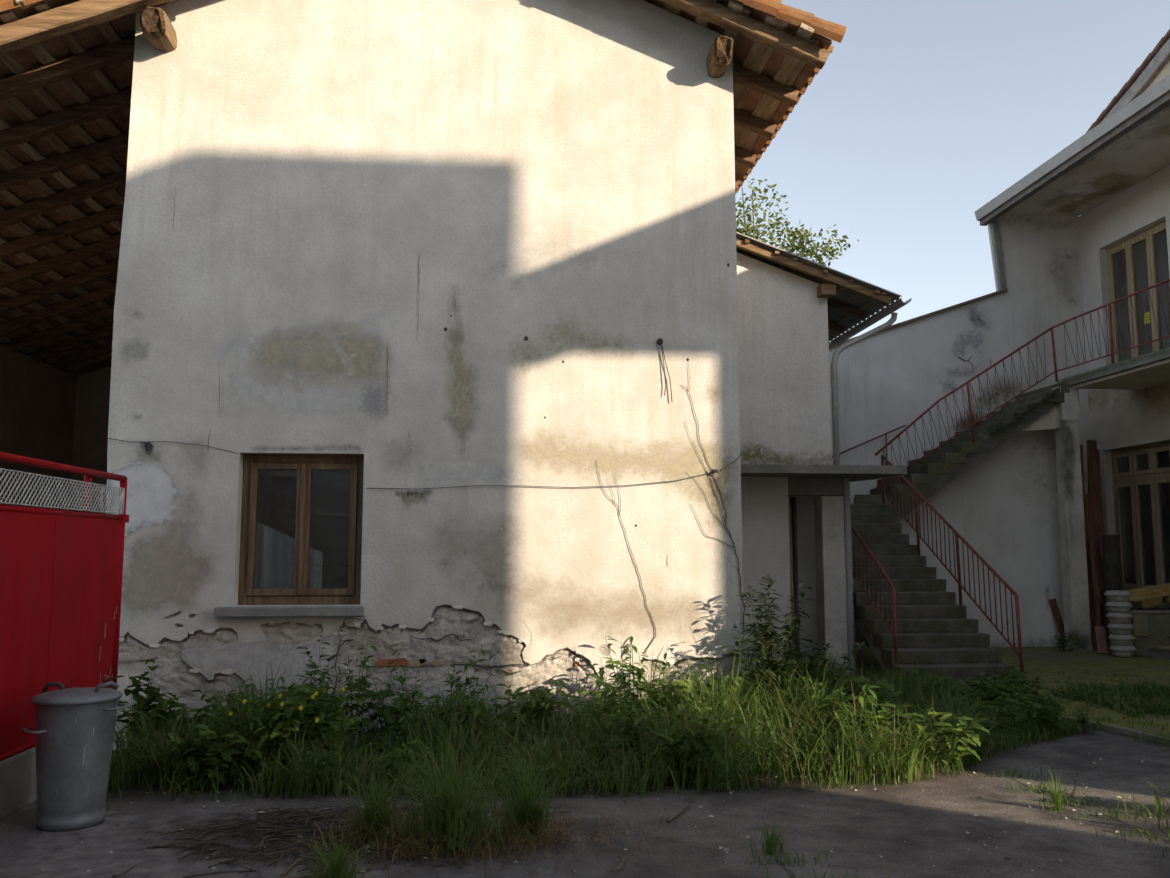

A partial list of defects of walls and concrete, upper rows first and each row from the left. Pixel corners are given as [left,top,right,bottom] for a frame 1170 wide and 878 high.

peeling [109,463,177,536]
leakage [525,443,733,505]
spalling [118,611,250,703]
spalling [261,604,611,717]
spalling [639,653,743,712]